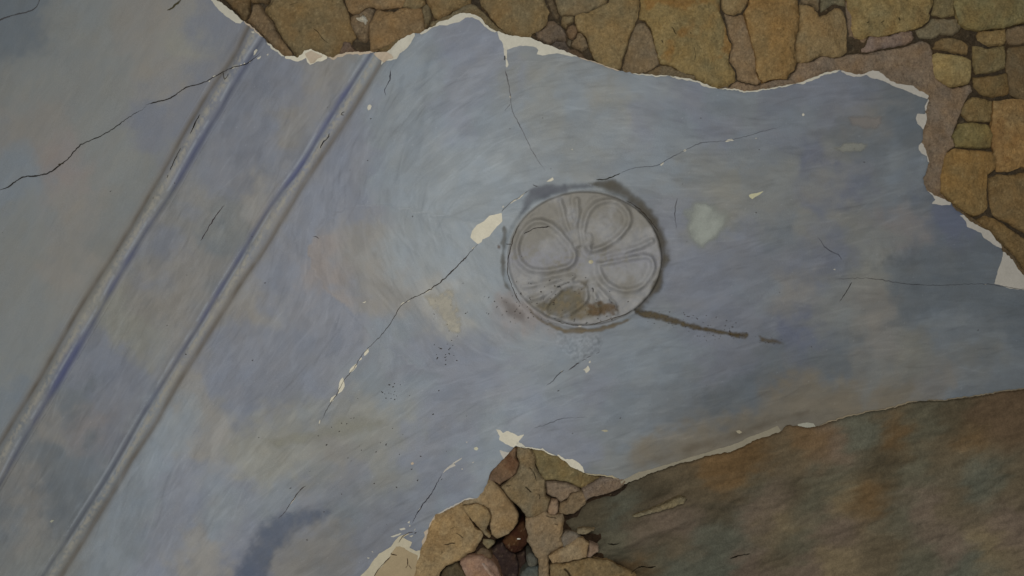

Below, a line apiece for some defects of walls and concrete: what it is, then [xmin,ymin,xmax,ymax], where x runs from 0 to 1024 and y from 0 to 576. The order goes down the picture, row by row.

crack [0,31,268,190]
spalling [211,0,1024,290]
crack [319,245,477,423]
crack [413,442,474,521]
spalling [361,426,781,576]